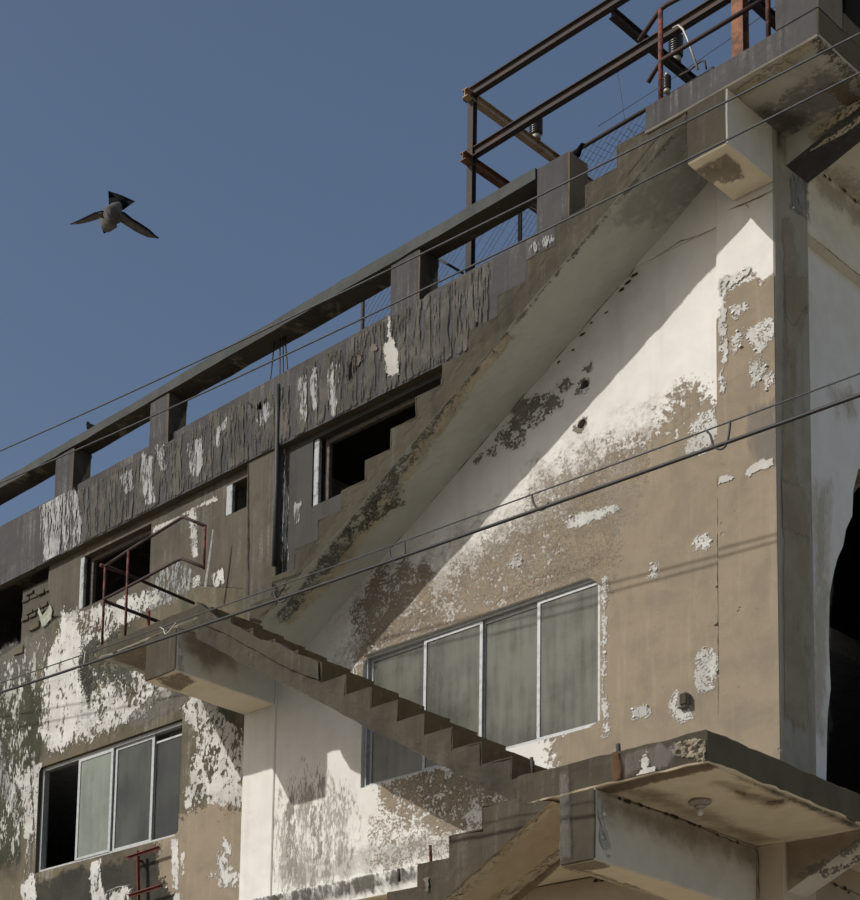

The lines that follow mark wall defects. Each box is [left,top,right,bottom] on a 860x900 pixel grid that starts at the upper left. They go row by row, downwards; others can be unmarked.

spalling [270,336,288,379]
peeling [347,272,780,775]
damp [35,844,175,900]
peeling [152,797,242,900]
damp [253,766,414,900]
peeling [363,768,494,873]
damp [597,763,718,793]
damp [754,784,859,827]
damp [798,839,860,880]